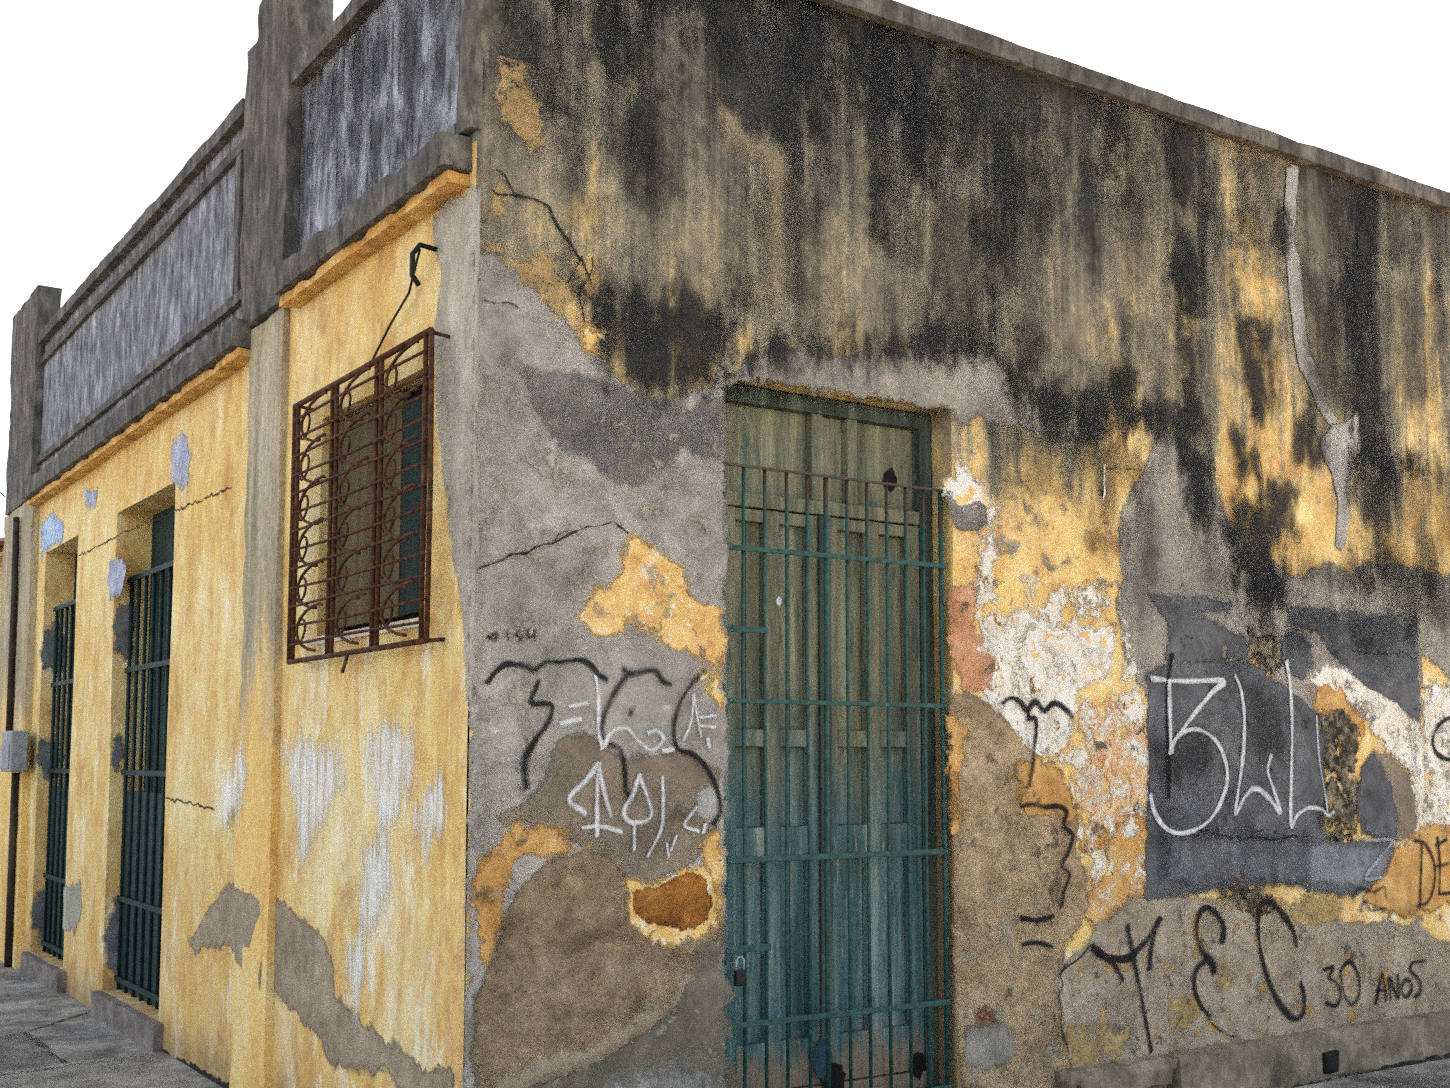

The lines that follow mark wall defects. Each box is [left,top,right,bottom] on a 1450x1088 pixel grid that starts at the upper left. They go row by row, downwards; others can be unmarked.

leakage [493,57,545,152]
leakage [592,0,623,73]
leakage [799,1,947,243]
crack [491,168,594,323]
leakage [484,119,1303,613]
leakage [1292,406,1326,470]
leakage [1346,190,1415,487]
crack [478,521,629,569]
peeling [188,185,1450,1088]